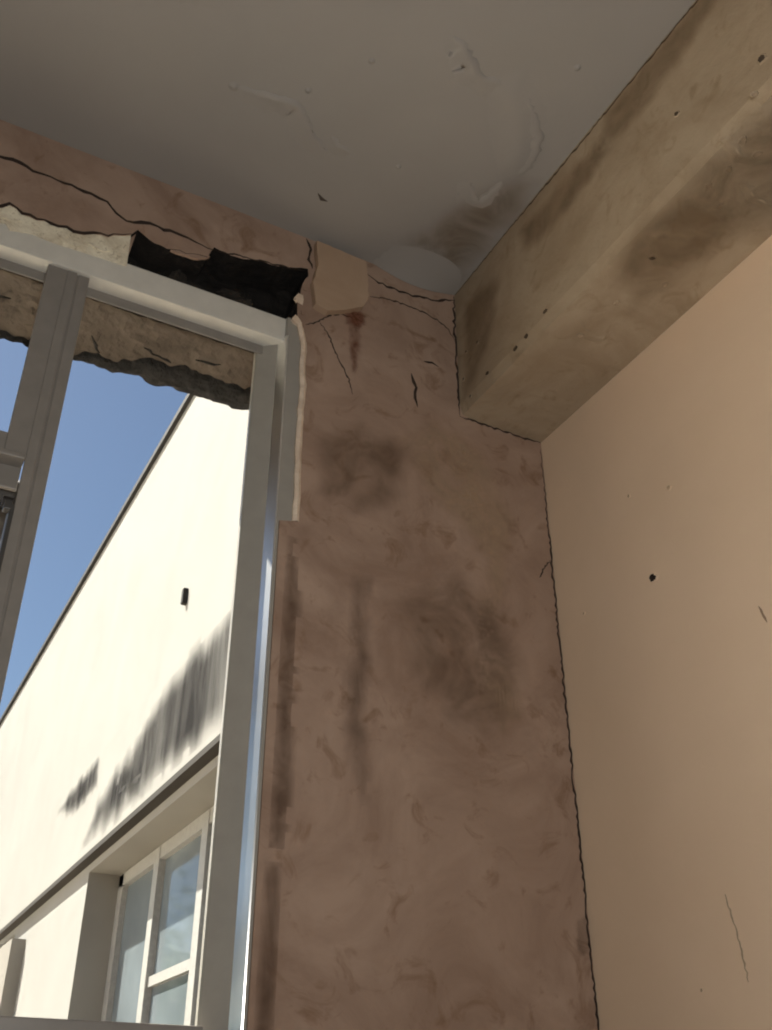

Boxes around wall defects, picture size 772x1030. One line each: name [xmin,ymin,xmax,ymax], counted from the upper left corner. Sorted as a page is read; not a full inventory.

spalling [0,202,151,272]
crack [0,155,313,271]
spalling [0,268,44,347]
spalling [73,297,254,410]
spalling [164,250,309,522]
crack [305,314,353,394]
crack [369,0,698,1030]
crack [725,895,748,980]